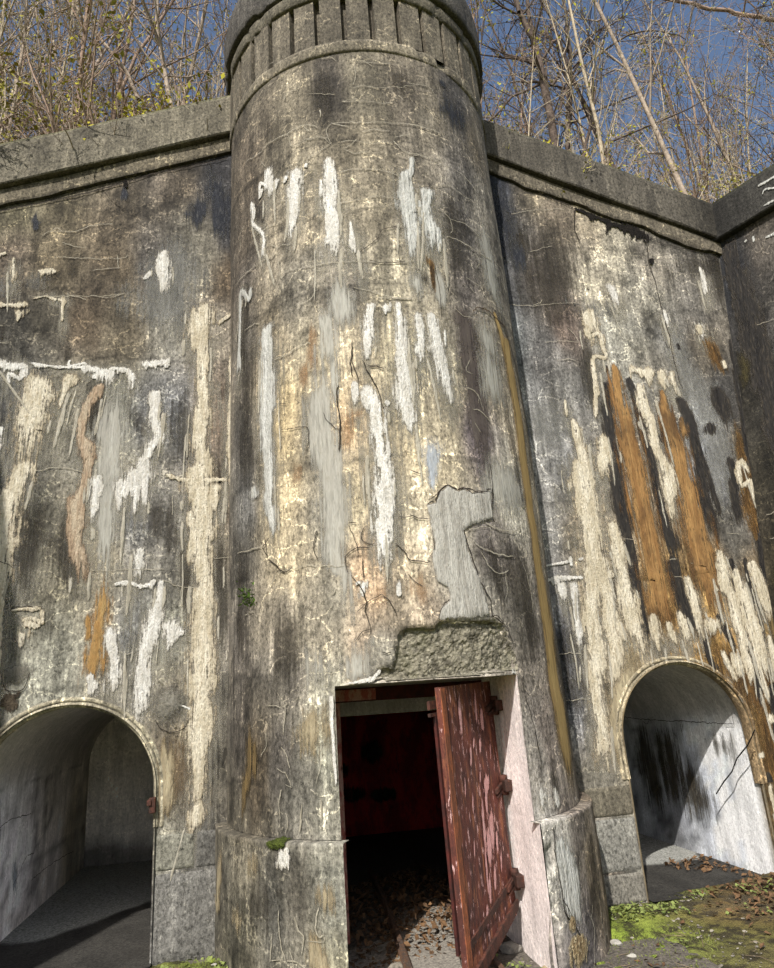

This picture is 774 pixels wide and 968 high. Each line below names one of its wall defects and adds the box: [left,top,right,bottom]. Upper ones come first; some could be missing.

crack [281,341,385,450]
corrosion [704,338,725,374]
corrosion [83,580,110,675]
crack [215,463,533,661]
spalling [373,485,518,682]
corrosion [494,312,571,775]
corrosion [605,363,774,781]
water stain [633,721,718,821]